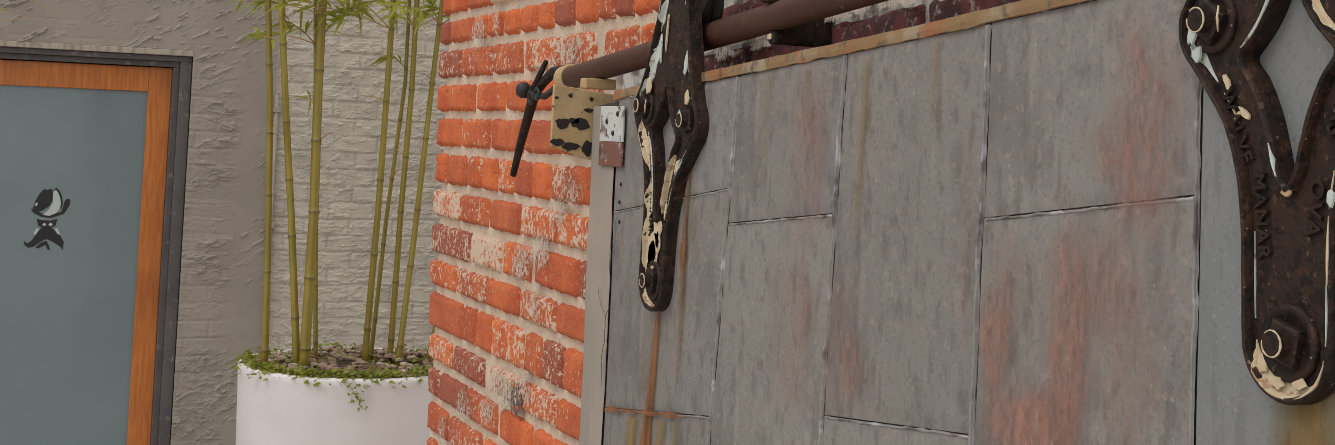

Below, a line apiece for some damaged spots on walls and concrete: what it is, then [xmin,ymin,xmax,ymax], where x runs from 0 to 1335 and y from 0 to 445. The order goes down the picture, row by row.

corrosion [604,314,685,445]
corrosion [1279,400,1334,445]